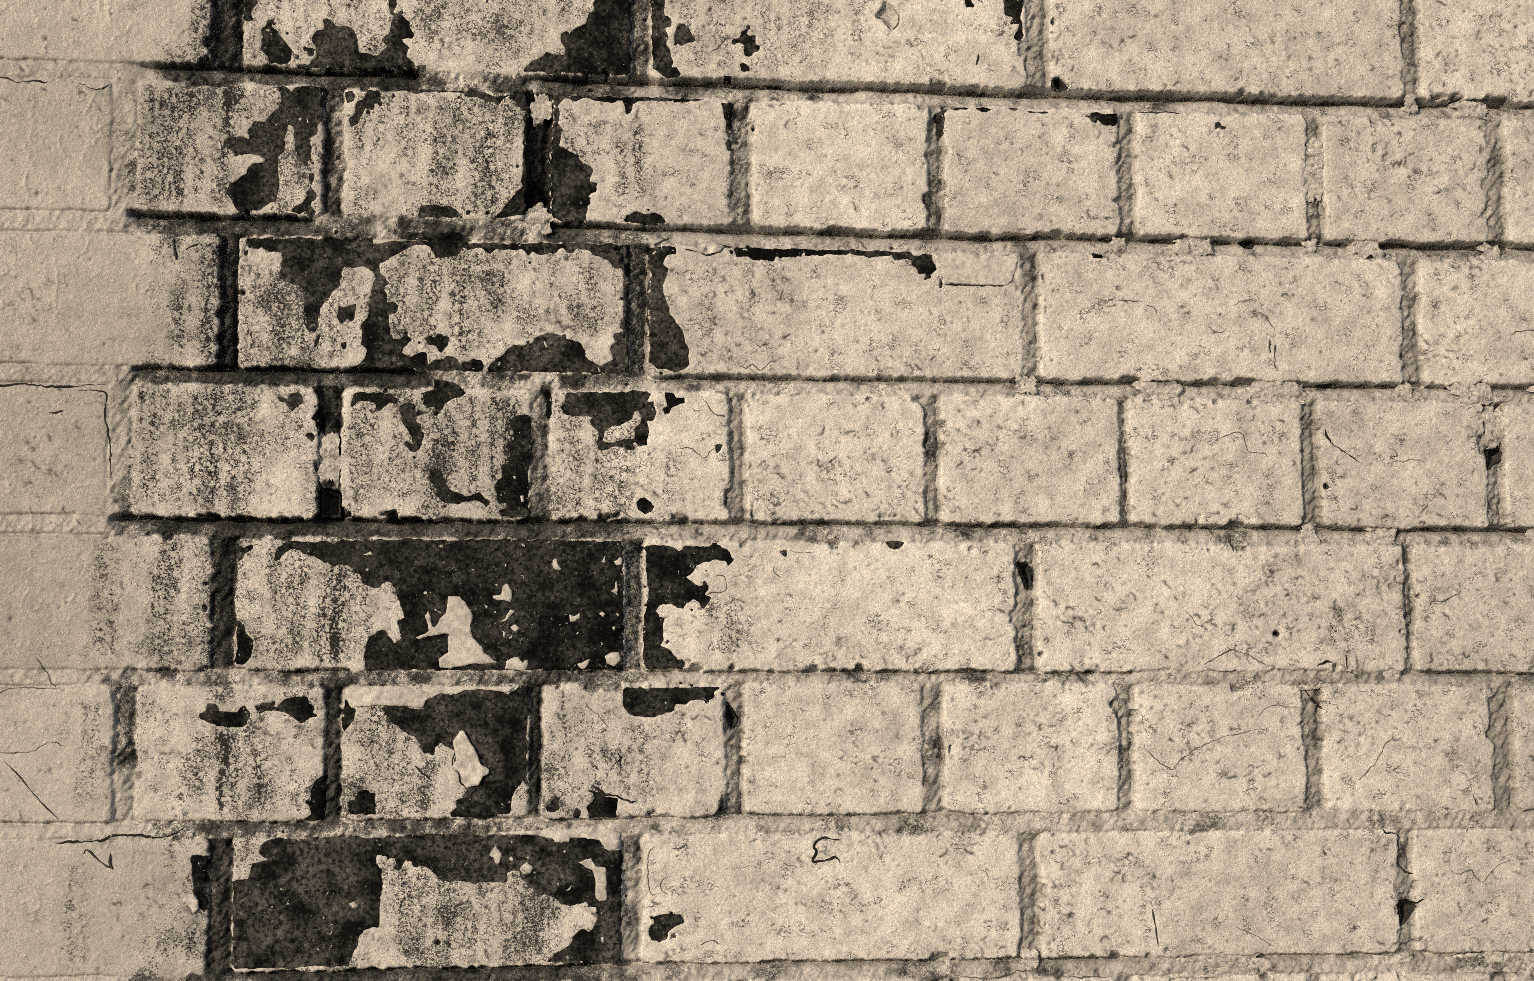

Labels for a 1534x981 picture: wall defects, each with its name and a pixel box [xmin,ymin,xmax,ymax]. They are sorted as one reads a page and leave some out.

peeling [224,0,1018,518]
peeling [885,540,904,550]
peeling [199,696,317,728]
peeling [231,534,734,969]
peeling [190,855,213,912]